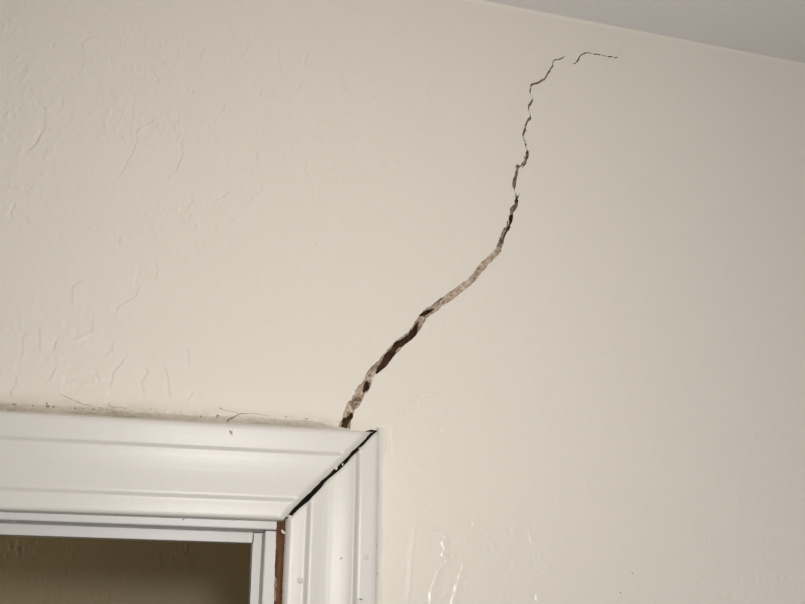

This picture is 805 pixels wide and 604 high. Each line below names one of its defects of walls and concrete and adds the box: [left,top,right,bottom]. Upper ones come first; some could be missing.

crack [276,52,617,522]